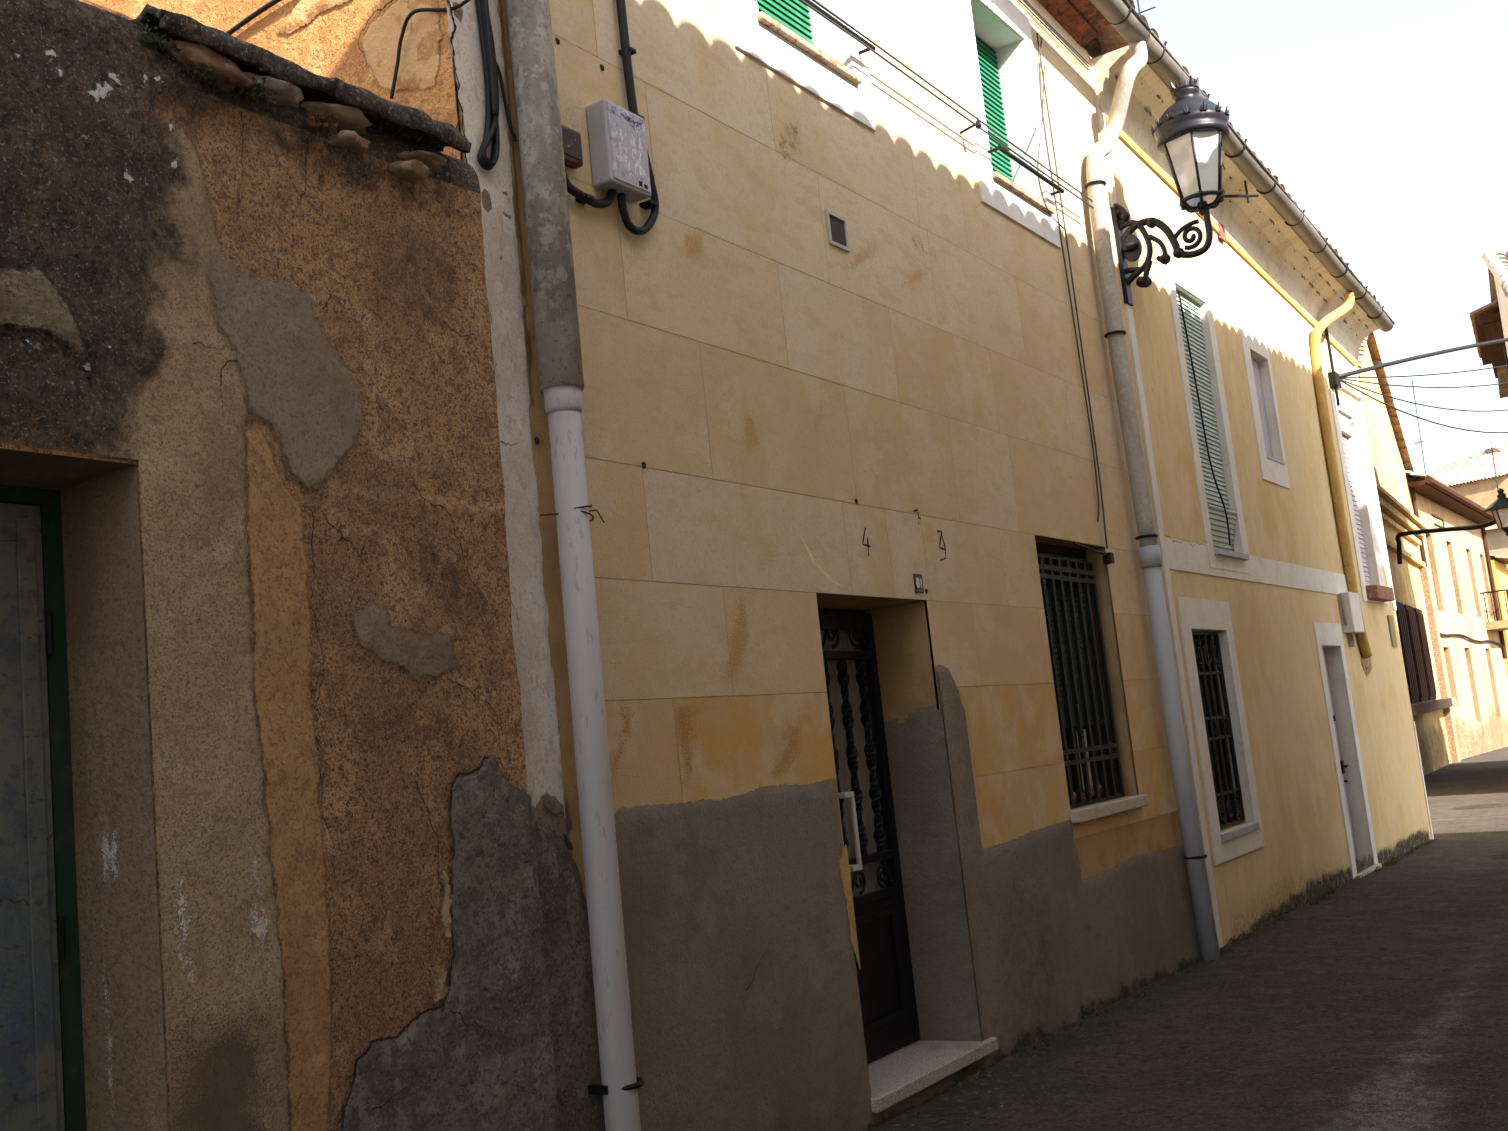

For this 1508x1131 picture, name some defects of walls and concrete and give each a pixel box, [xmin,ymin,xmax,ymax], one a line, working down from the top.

spalling [277,0,349,34]
spalling [362,0,463,92]
spalling [337,755,606,1131]